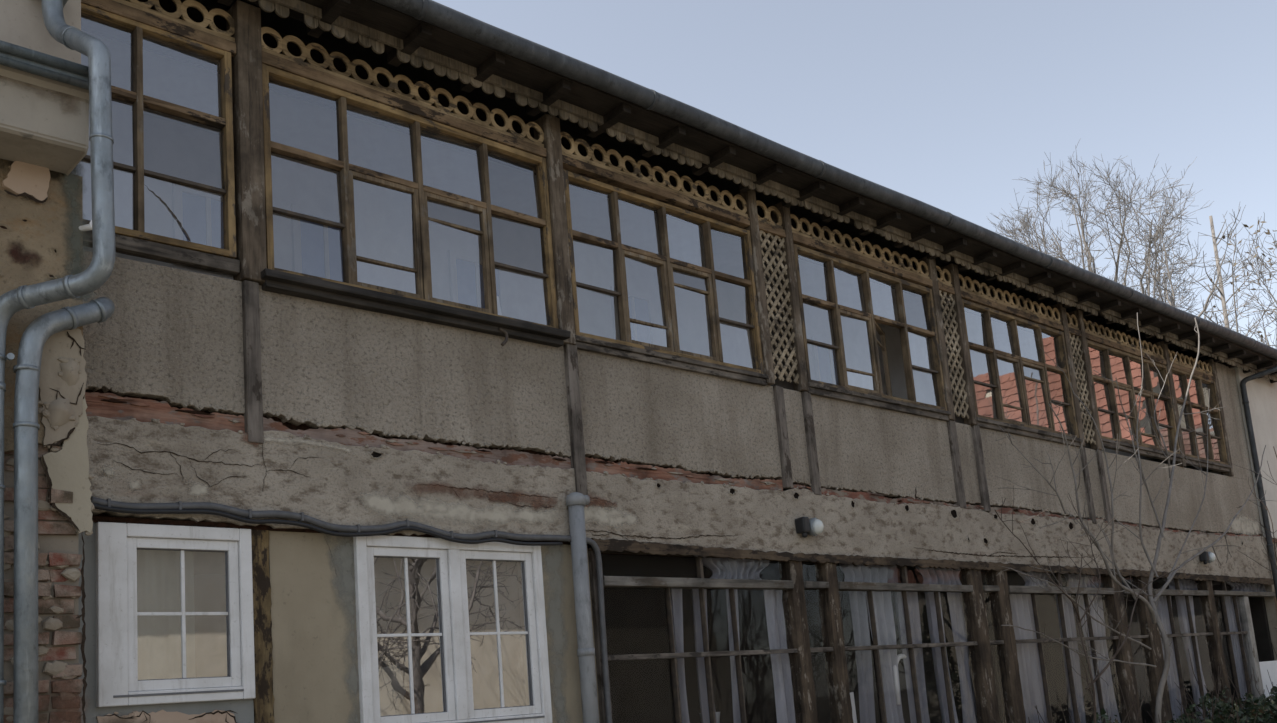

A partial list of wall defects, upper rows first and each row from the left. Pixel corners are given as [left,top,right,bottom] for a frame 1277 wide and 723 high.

peeling [2,161,51,204]
peeling [38,328,245,536]
crack [98,443,319,492]
crack [414,484,557,508]
crack [586,497,735,543]
spalling [263,412,1277,546]
flaking render [4,579,14,661]
flaking render [38,552,83,723]
peeling [96,710,235,723]